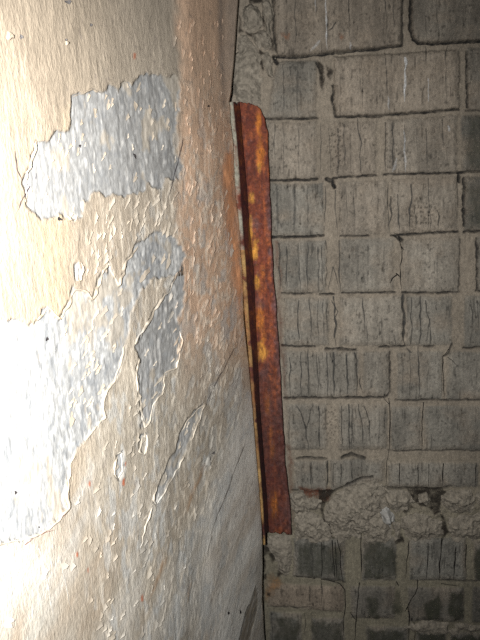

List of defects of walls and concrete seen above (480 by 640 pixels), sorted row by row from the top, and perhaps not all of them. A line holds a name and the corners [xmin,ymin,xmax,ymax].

crack [390,236,404,289]
peeling [0,72,234,545]
spalling [319,489,333,522]
spalling [404,487,449,536]
peeling [95,598,126,640]